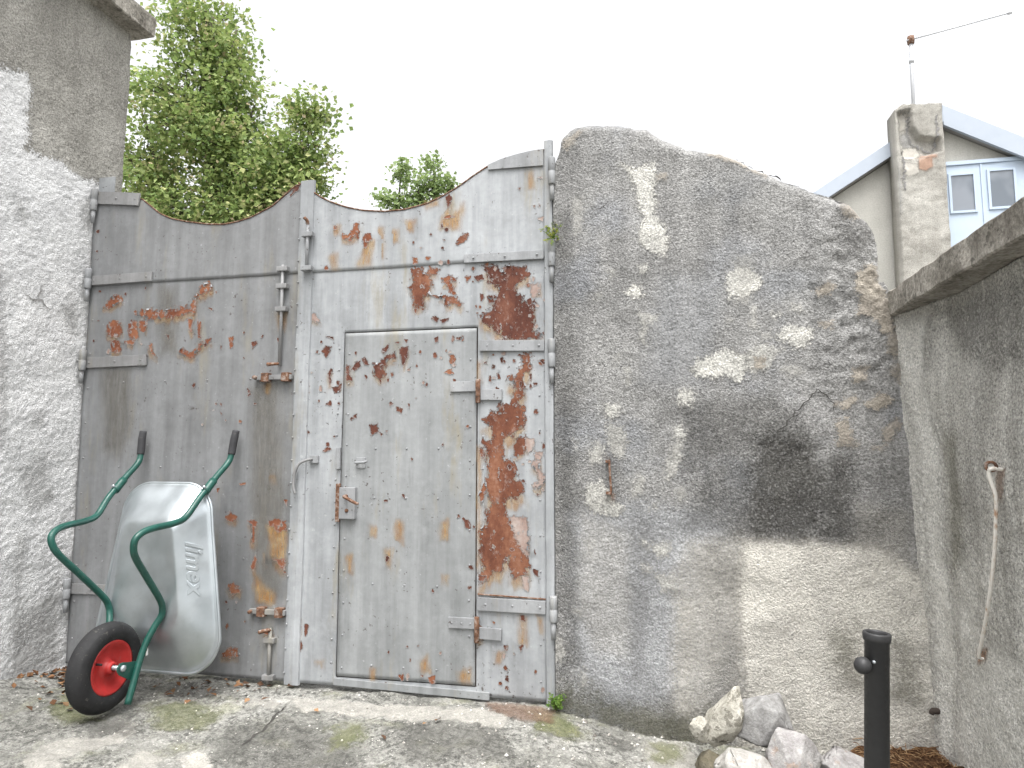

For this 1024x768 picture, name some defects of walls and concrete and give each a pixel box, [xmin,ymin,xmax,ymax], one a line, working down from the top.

spalling [901,148,937,176]
corrosion [103,281,258,359]
corrosion [321,336,409,406]
corrosion [406,256,545,585]
crack [777,389,836,435]
water stain [752,433,847,541]
corrosion [225,499,288,603]